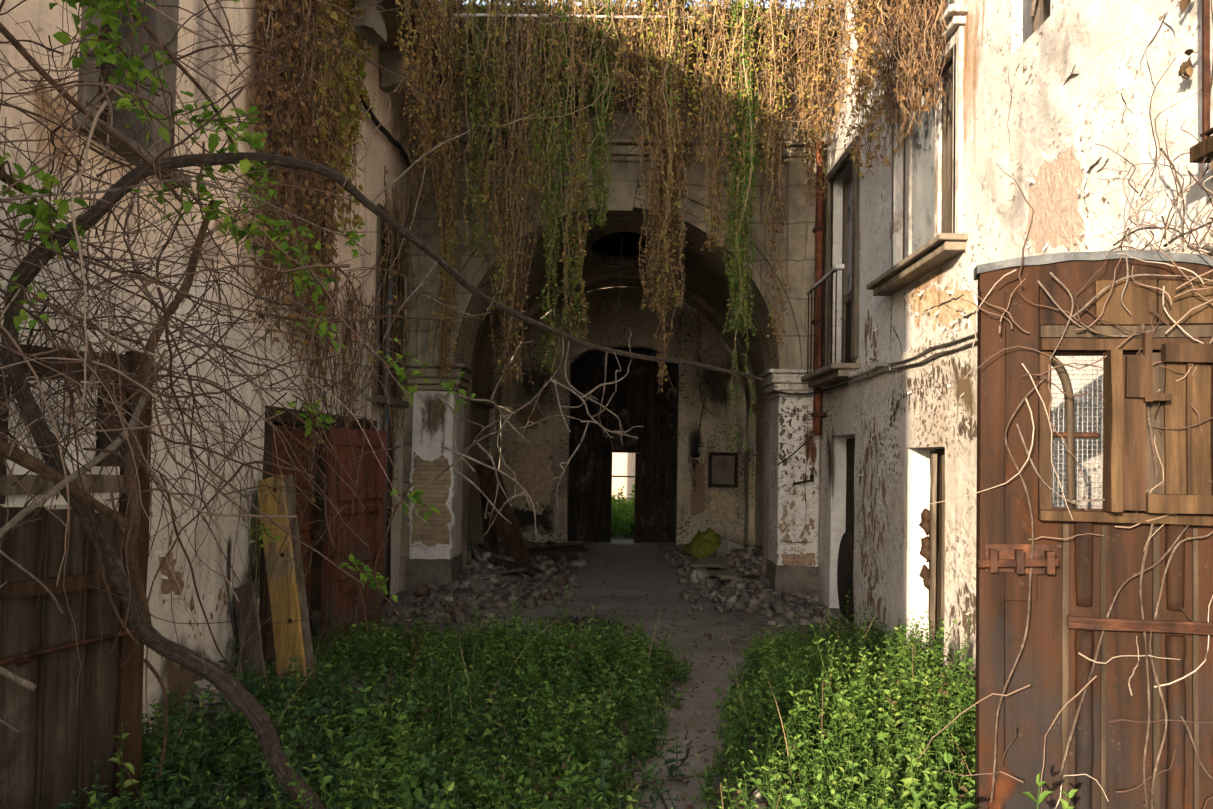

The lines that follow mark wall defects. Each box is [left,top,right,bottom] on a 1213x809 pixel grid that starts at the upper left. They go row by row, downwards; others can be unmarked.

flaking render [1022,131,1091,256]
flaking render [407,450,455,551]
flaking render [776,406,819,567]
flaking render [858,278,978,630]
peeling [948,583,976,681]
corrosion [988,771,1015,809]